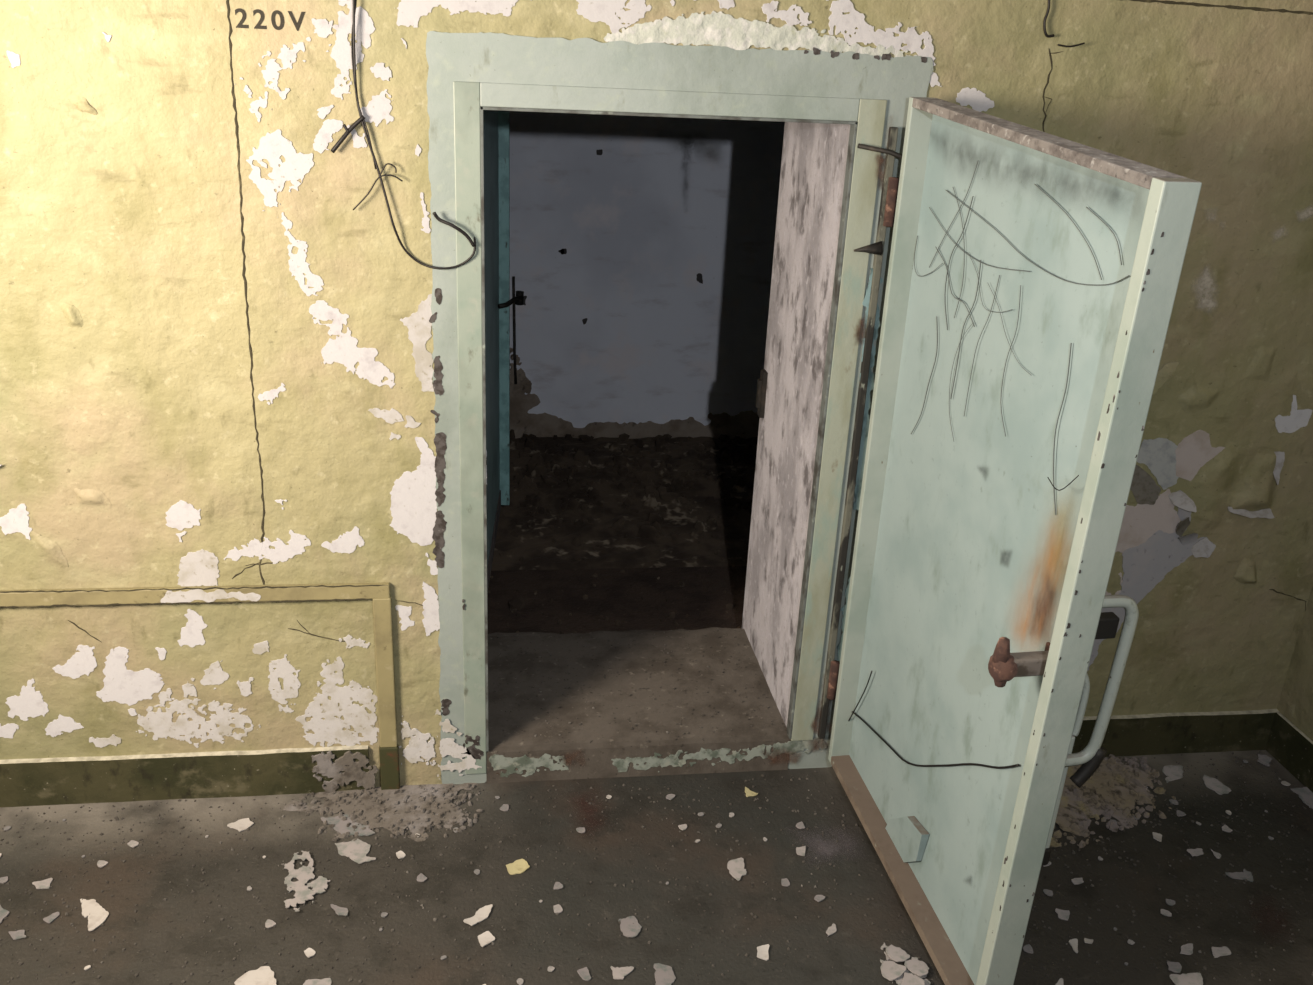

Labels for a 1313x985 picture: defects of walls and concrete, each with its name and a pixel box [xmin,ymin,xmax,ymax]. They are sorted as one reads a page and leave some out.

peeling [396,0,532,49]
peeling [576,0,942,87]
peeling [956,87,994,112]
crack [1042,49,1063,132]
peeling [240,0,395,388]
peeling [400,294,434,392]
peeling [1275,395,1313,433]
peeling [0,504,32,540]
peeling [368,408,440,636]
peeling [1063,426,1225,671]
peeling [52,500,379,793]
peeling [0,679,121,748]